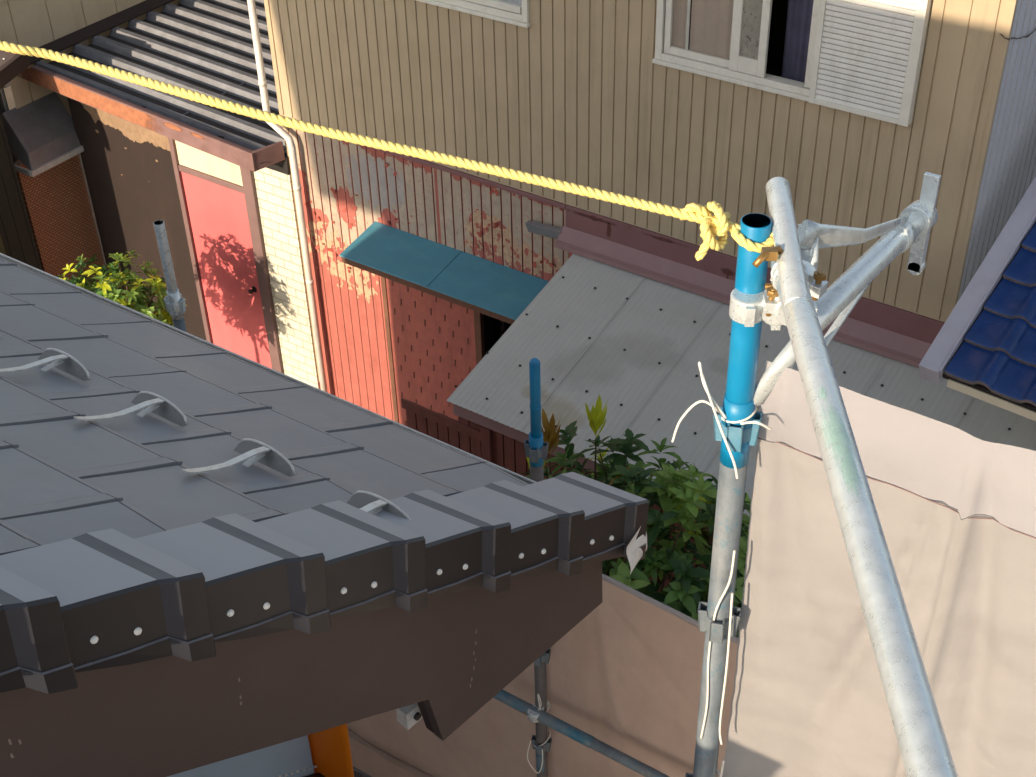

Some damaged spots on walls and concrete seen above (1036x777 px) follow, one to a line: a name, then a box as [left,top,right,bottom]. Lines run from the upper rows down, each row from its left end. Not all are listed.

peeling [80,102,170,162]
peeling [286,127,568,307]